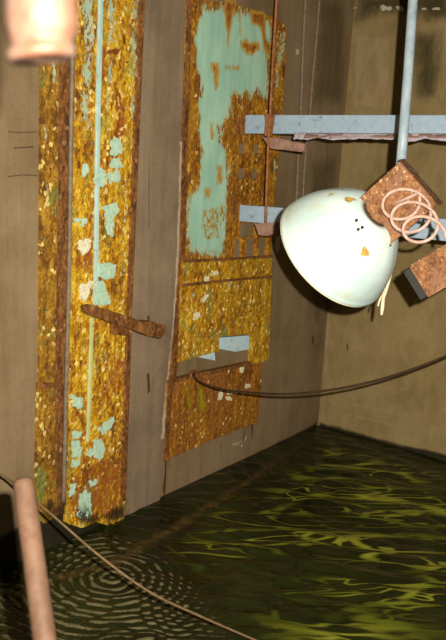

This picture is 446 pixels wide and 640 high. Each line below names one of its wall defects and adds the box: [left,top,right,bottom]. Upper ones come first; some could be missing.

rust [223,0,241,46]
rust [240,10,273,58]
rust [211,62,240,90]
peeling [186,2,285,258]
peeling [82,137,127,237]
rust [201,206,226,241]
peeling [77,238,91,256]
peeling [79,262,125,306]
peeling [71,394,83,409]
peeling [71,402,115,468]
peeling [68,478,98,521]
rust [72,459,122,517]